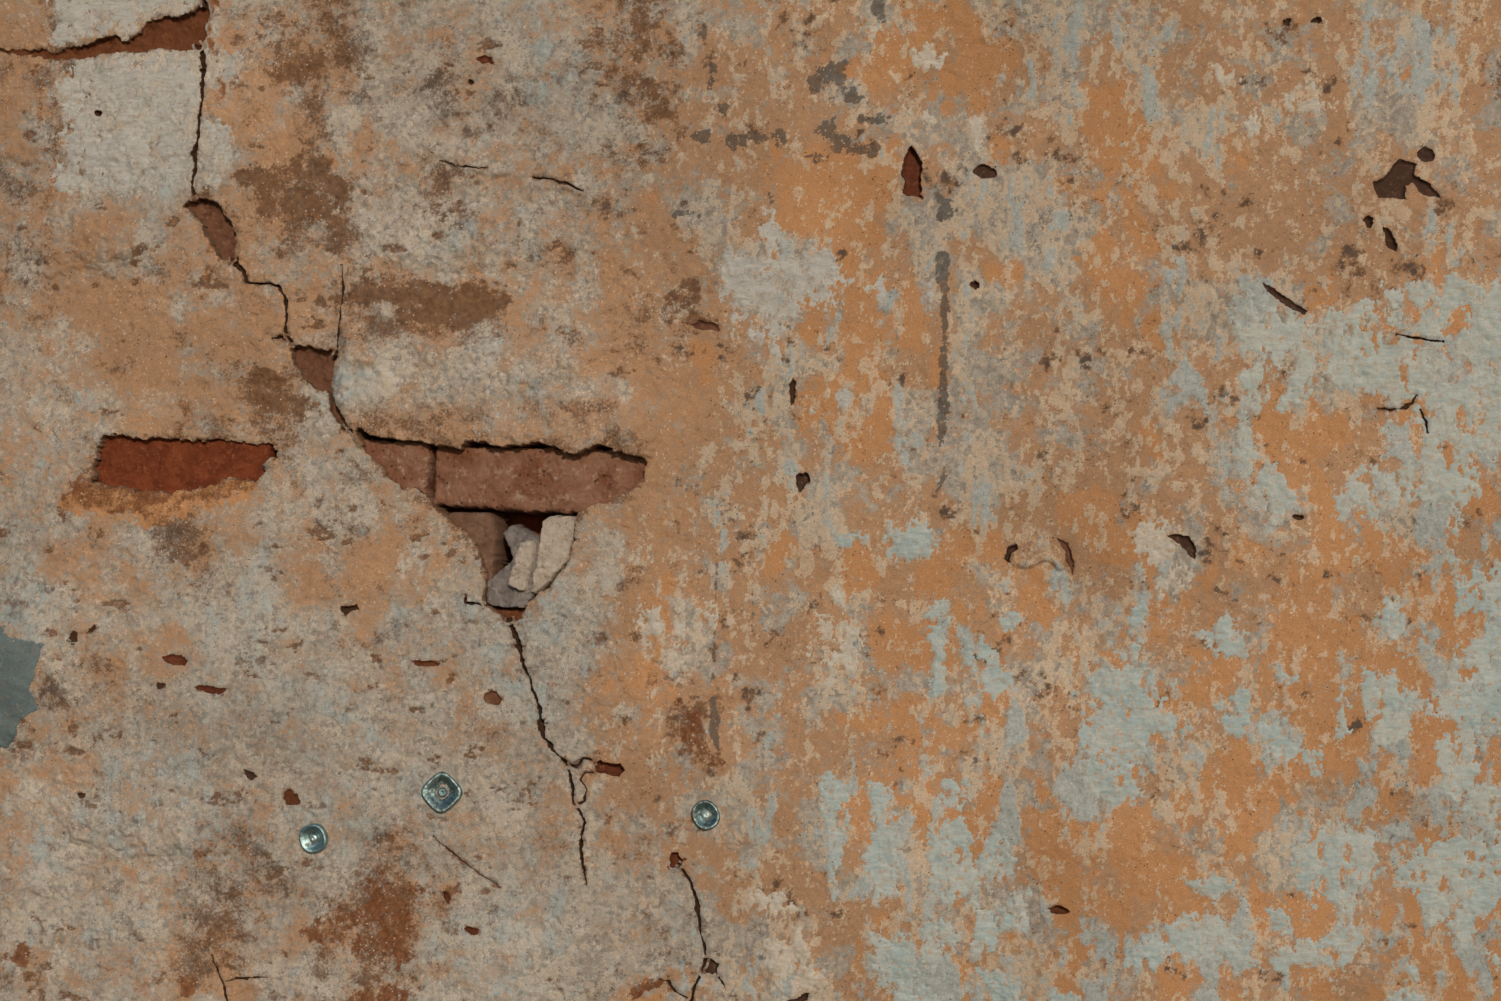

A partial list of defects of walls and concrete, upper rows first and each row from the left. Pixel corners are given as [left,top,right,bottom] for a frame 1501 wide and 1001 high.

peeling [0,0,238,267]
crack [187,0,209,201]
crack [227,253,347,356]
peeling [689,205,890,423]
spalling [1360,143,1443,254]
spalling [87,431,280,498]
crack [342,419,360,436]
spalling [286,341,650,626]
peeling [1078,271,1501,982]
crack [461,595,598,885]
crack [659,860,729,1001]
peeling [868,777,1032,1001]